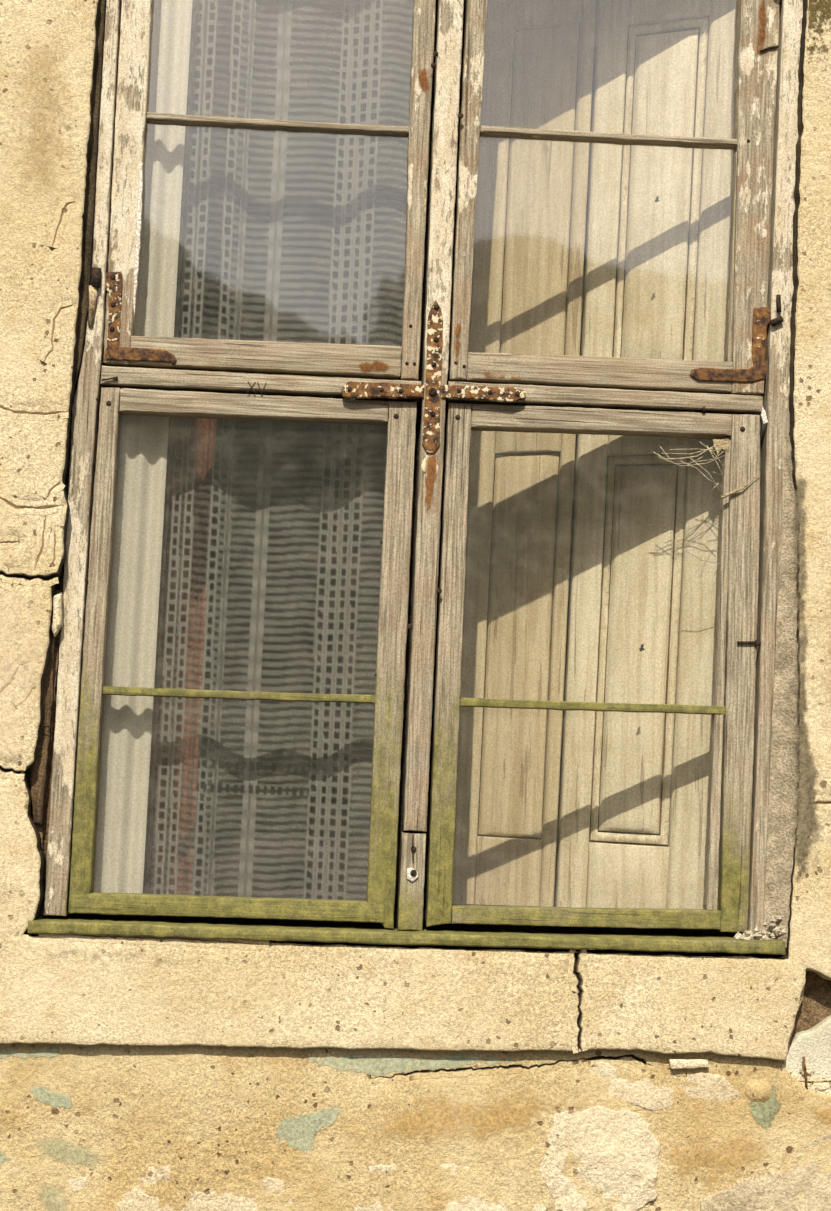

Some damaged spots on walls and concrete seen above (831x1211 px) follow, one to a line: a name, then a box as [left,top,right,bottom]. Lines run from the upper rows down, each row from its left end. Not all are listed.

peeling [807,0,831,71]
rust [360,361,387,372]
crack [0,399,69,421]
rust [425,455,437,510]
crack [0,477,65,587]
crack [812,795,831,810]
crack [371,949,698,1086]
flaking render [782,970,831,1095]
flaking render [368,1163,398,1172]
flaking render [444,1195,508,1211]
flaking render [532,1058,780,1211]
flaking render [700,1134,831,1211]